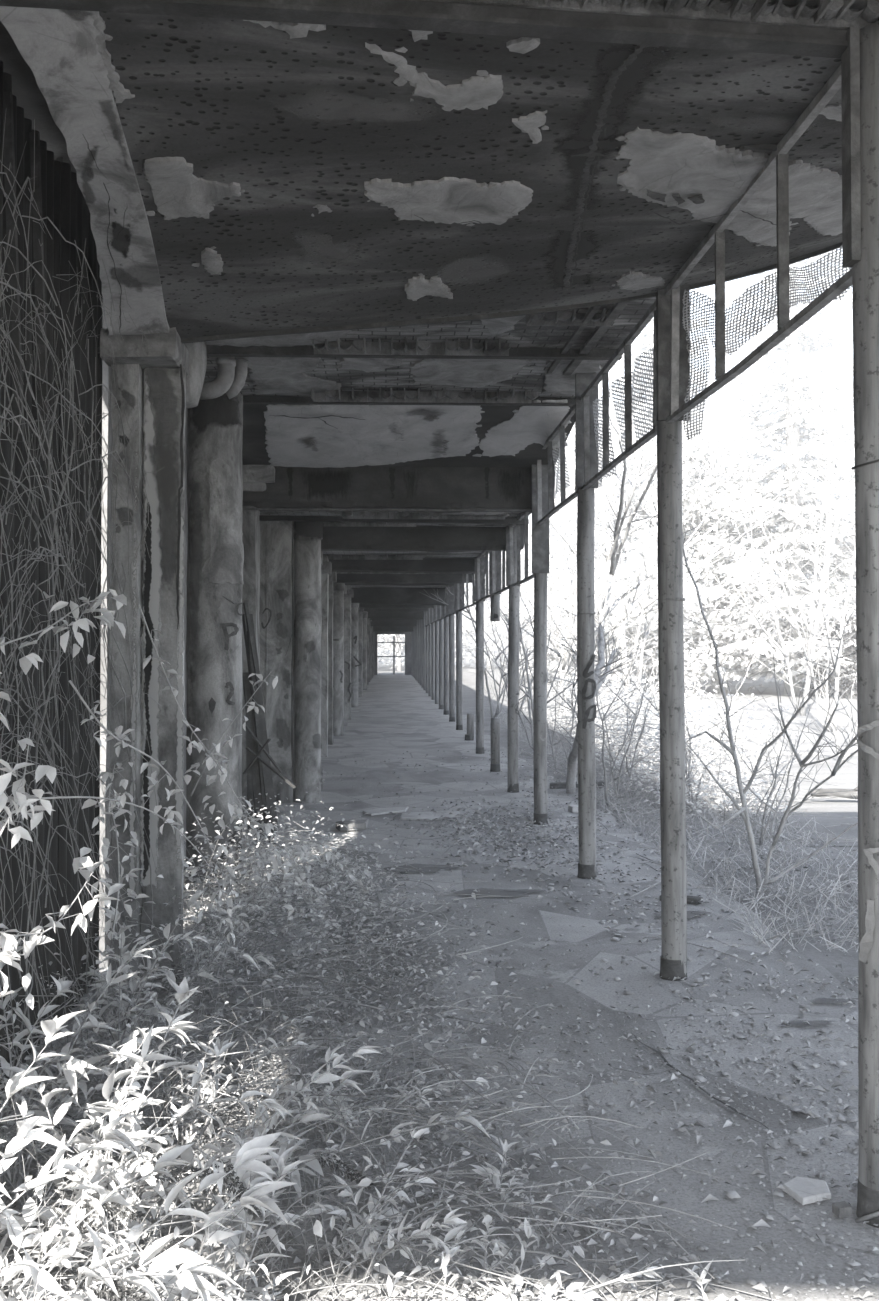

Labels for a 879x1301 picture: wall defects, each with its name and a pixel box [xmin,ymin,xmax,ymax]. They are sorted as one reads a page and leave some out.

peeling [92,11,135,103]
peeling [365,30,503,111]
peeling [506,37,540,54]
peeling [512,110,549,144]
peeling [143,156,245,220]
peeling [364,177,533,232]
peeling [616,127,842,247]
flaking render [111,208,131,265]
peeling [192,246,223,275]
peeling [405,273,453,301]
peeling [204,330,607,468]